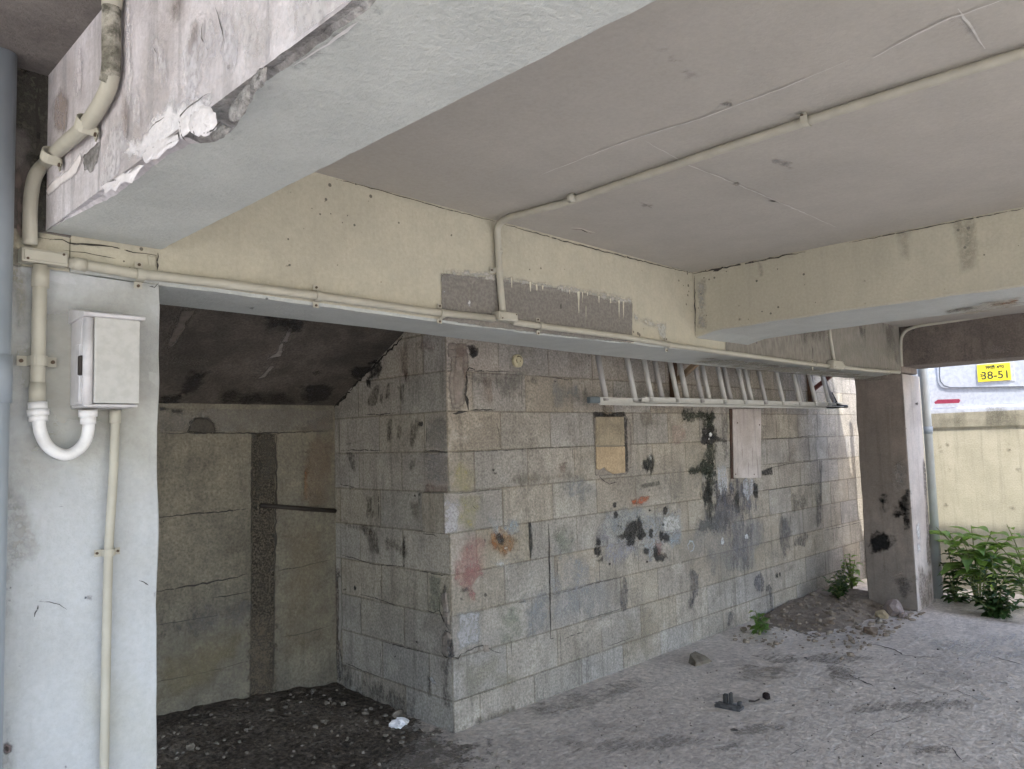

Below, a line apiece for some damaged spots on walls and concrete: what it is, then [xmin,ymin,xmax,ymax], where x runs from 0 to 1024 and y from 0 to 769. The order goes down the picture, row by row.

flaking render [101,67,267,193]
flaking render [46,142,100,195]
crack [855,208,1023,242]
water stain [266,316,303,332]
water stain [160,360,209,404]
water stain [222,385,332,405]
water stain [350,360,382,387]
crack [167,428,325,436]
water stain [682,409,753,569]
crack [159,508,248,518]
crack [157,574,246,625]